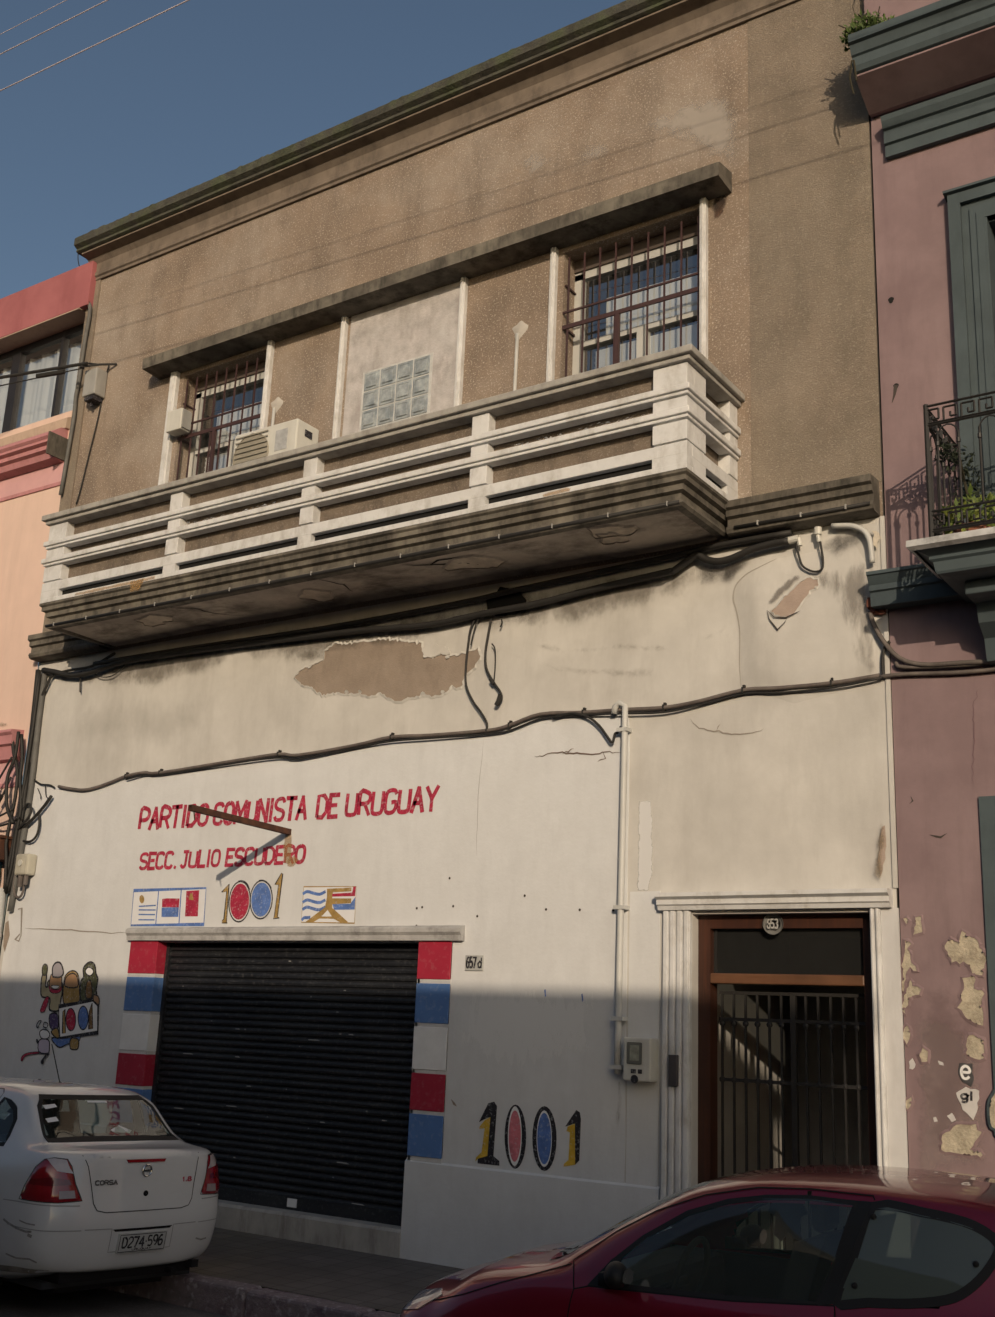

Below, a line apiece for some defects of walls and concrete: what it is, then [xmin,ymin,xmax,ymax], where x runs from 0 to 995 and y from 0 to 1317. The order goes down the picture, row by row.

spalling [767,576,821,630]
peeling [293,636,483,704]
crack [538,748,620,761]
crack [691,720,763,735]
peeling [901,914,931,1065]
peeling [942,928,988,1063]
peeling [938,1088,995,1160]